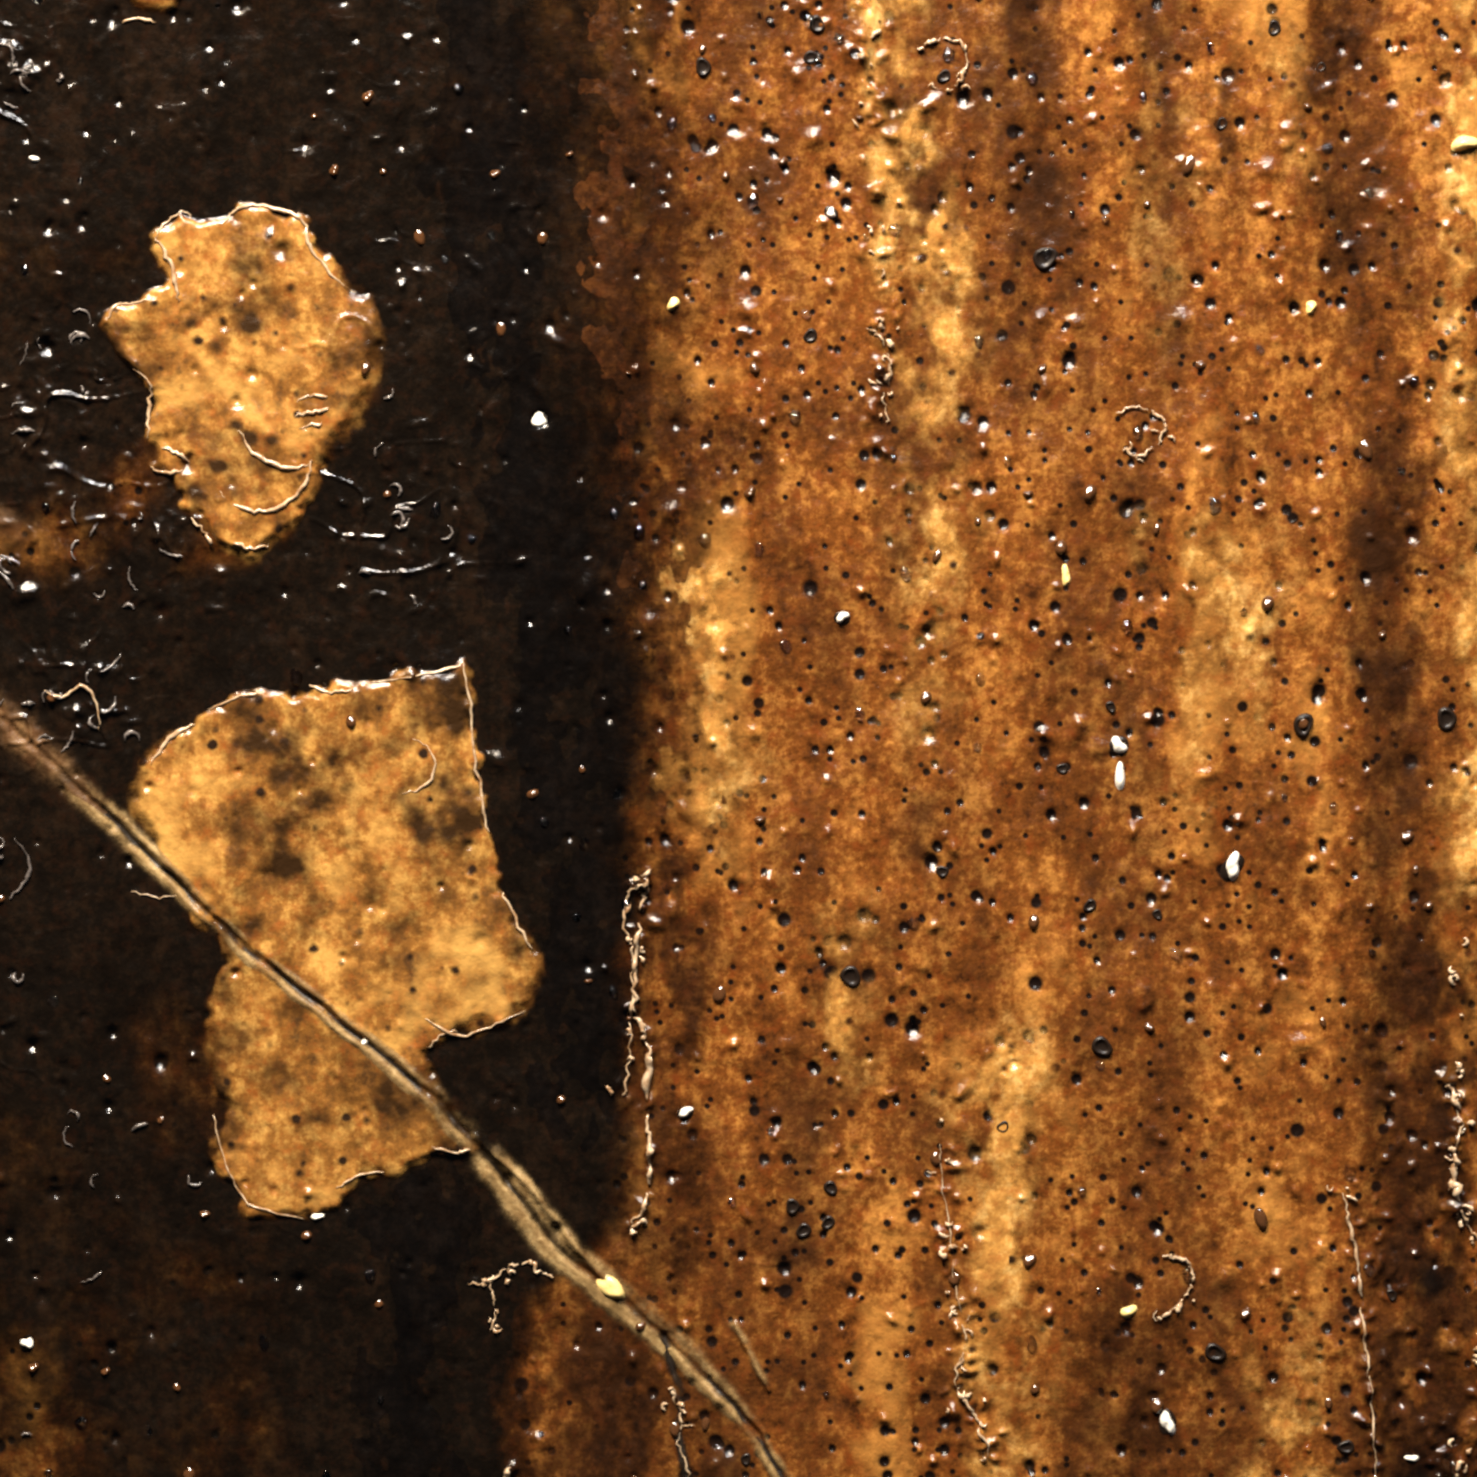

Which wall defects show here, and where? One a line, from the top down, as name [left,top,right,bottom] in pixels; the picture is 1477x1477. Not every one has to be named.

peeling [100,202,382,561]
corrosion [868,109,975,430]
corrosion [1440,76,1477,285]
crack [0,707,203,911]
crack [232,934,421,1094]
peeling [131,660,542,1219]
corrosion [662,559,746,824]
corrosion [901,489,964,598]
corrosion [1182,513,1276,726]
corrosion [1444,748,1477,900]
crack [443,1113,786,1477]
corrosion [968,1022,1058,1318]